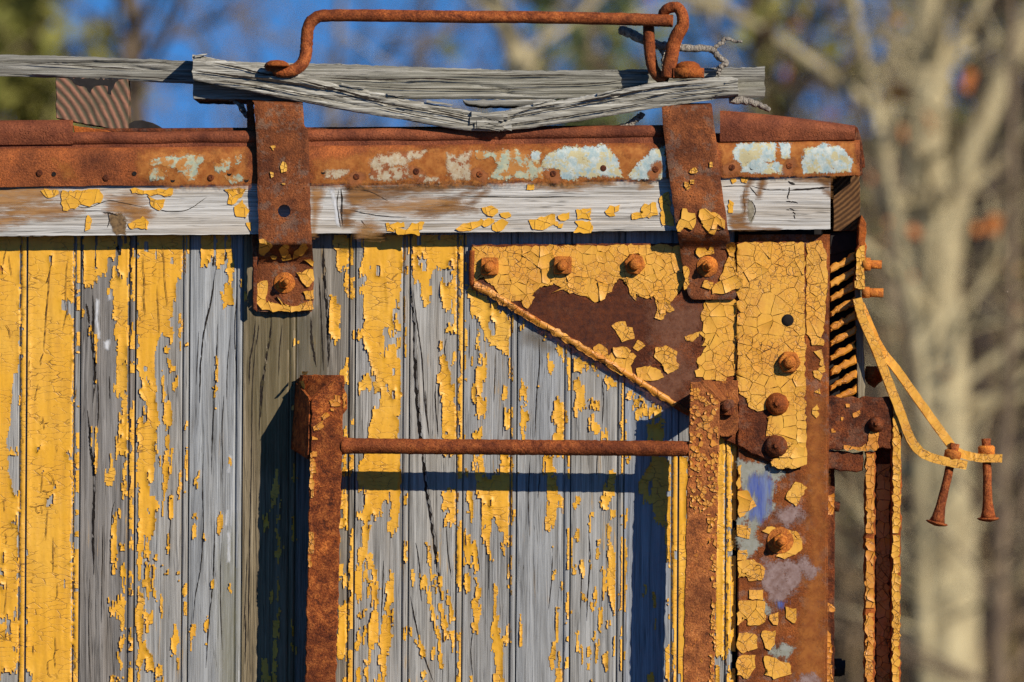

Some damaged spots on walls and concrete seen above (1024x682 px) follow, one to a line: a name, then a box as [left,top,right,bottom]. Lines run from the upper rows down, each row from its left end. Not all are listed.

rust [137,149,248,187]
peeling [326,169,348,180]
peeling [370,143,666,190]
peeling [730,142,853,184]
rust [529,290,701,398]
peeling [0,153,315,682]
peeling [291,192,828,682]
rust [761,398,828,682]